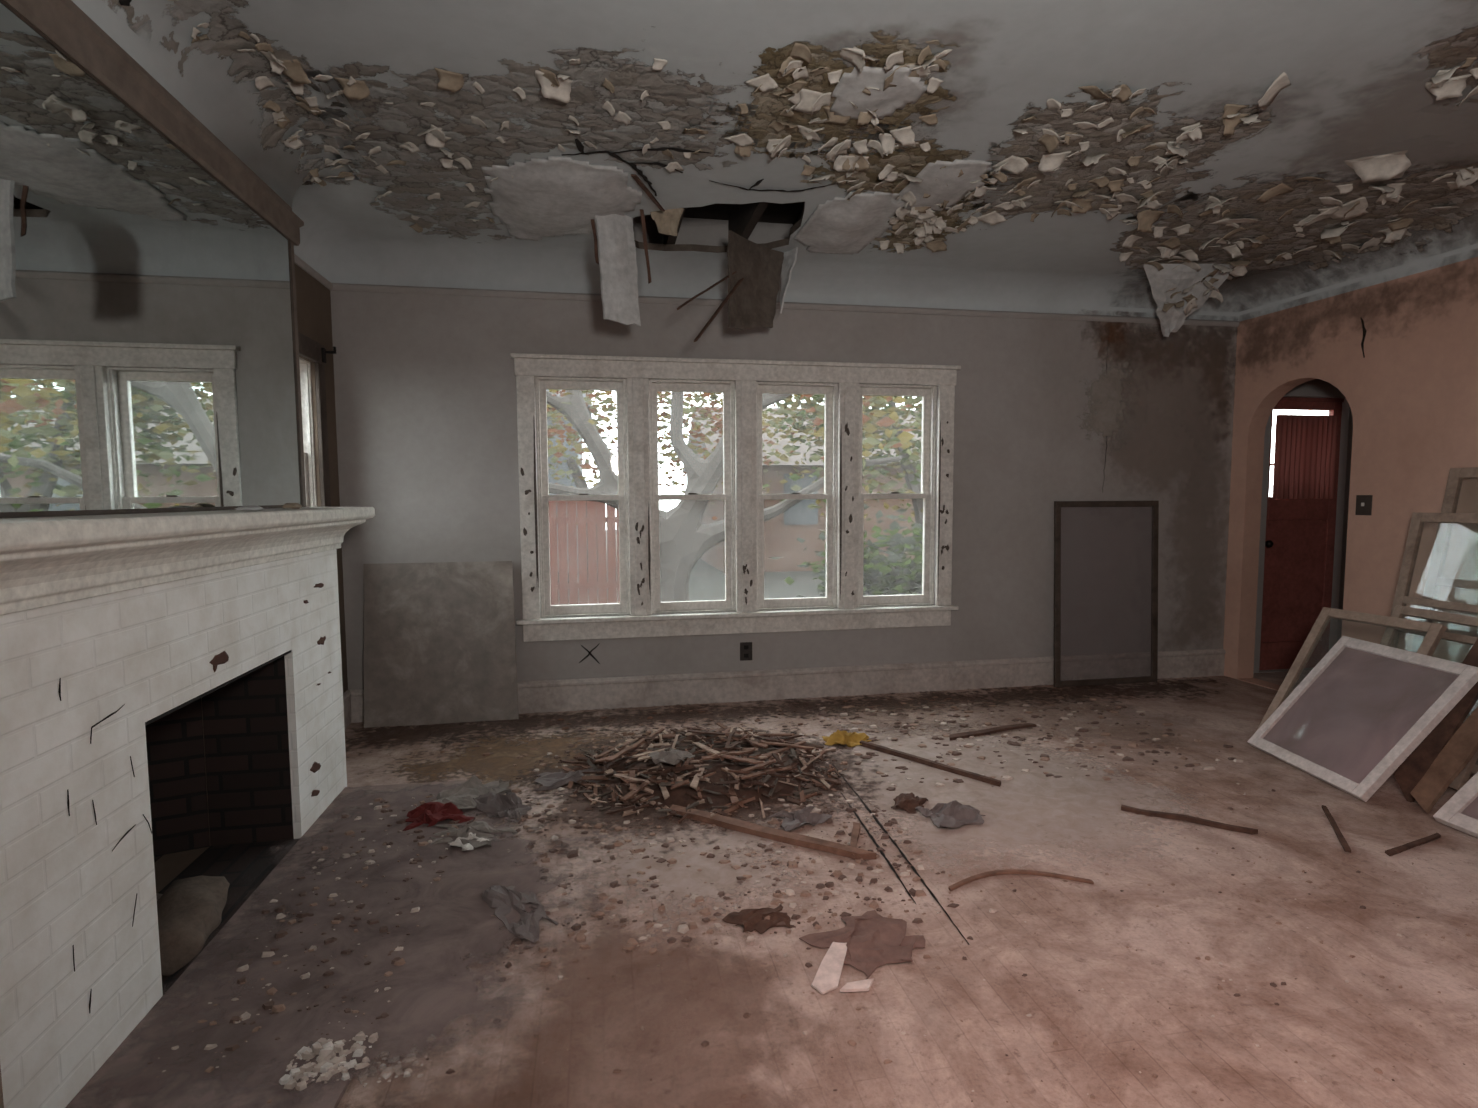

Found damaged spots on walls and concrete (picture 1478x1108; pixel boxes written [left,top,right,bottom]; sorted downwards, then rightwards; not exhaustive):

peeling [102,0,1478,342]